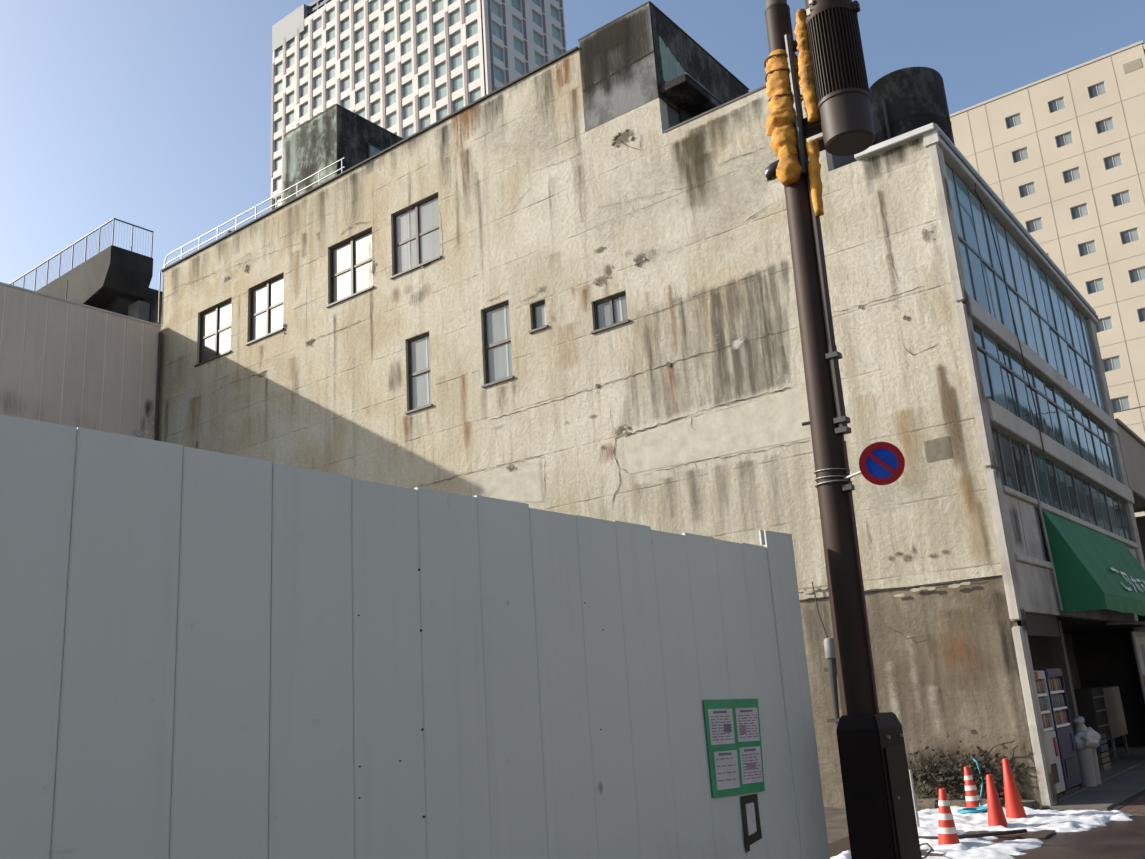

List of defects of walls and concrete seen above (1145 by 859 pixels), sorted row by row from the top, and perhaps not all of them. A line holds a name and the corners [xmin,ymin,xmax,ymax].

water stain [675,109,737,199]
water stain [710,264,787,402]
crack [490,333,809,507]
water stain [938,365,964,464]